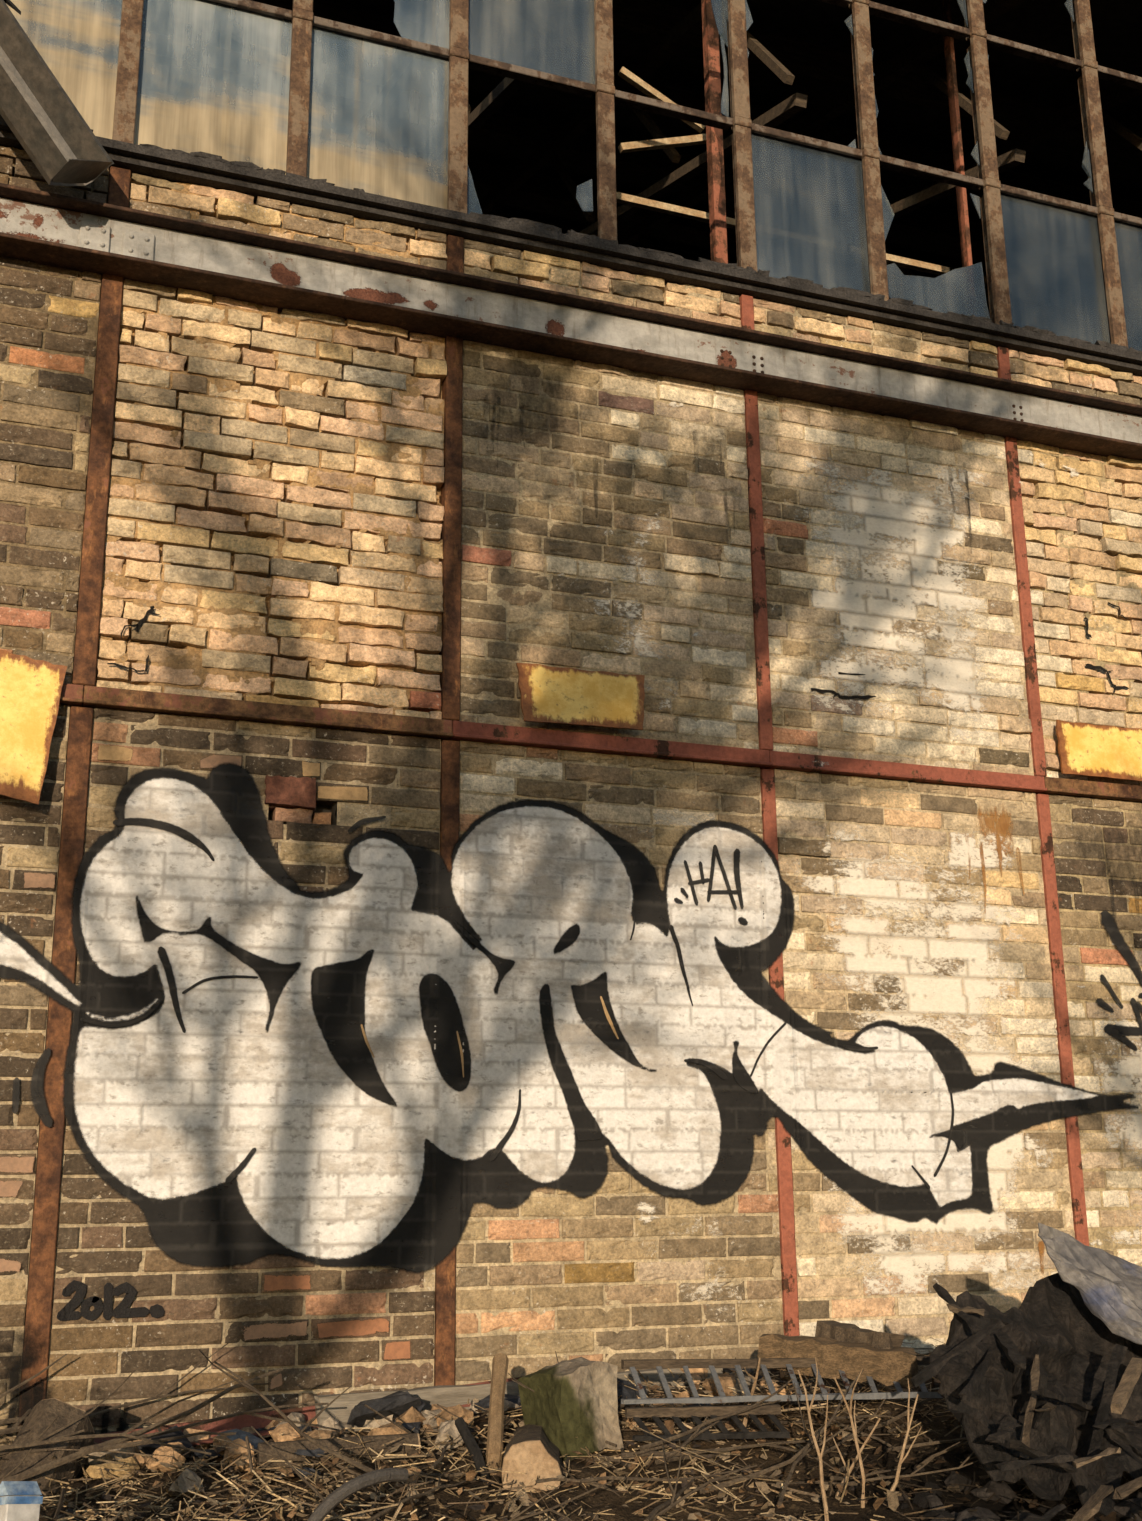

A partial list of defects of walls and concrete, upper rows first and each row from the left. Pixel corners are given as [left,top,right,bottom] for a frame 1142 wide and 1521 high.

crack [107,606,160,672]
crack [811,672,876,700]
crack [1084,602,1129,694]
corrosion [969,809,1024,913]